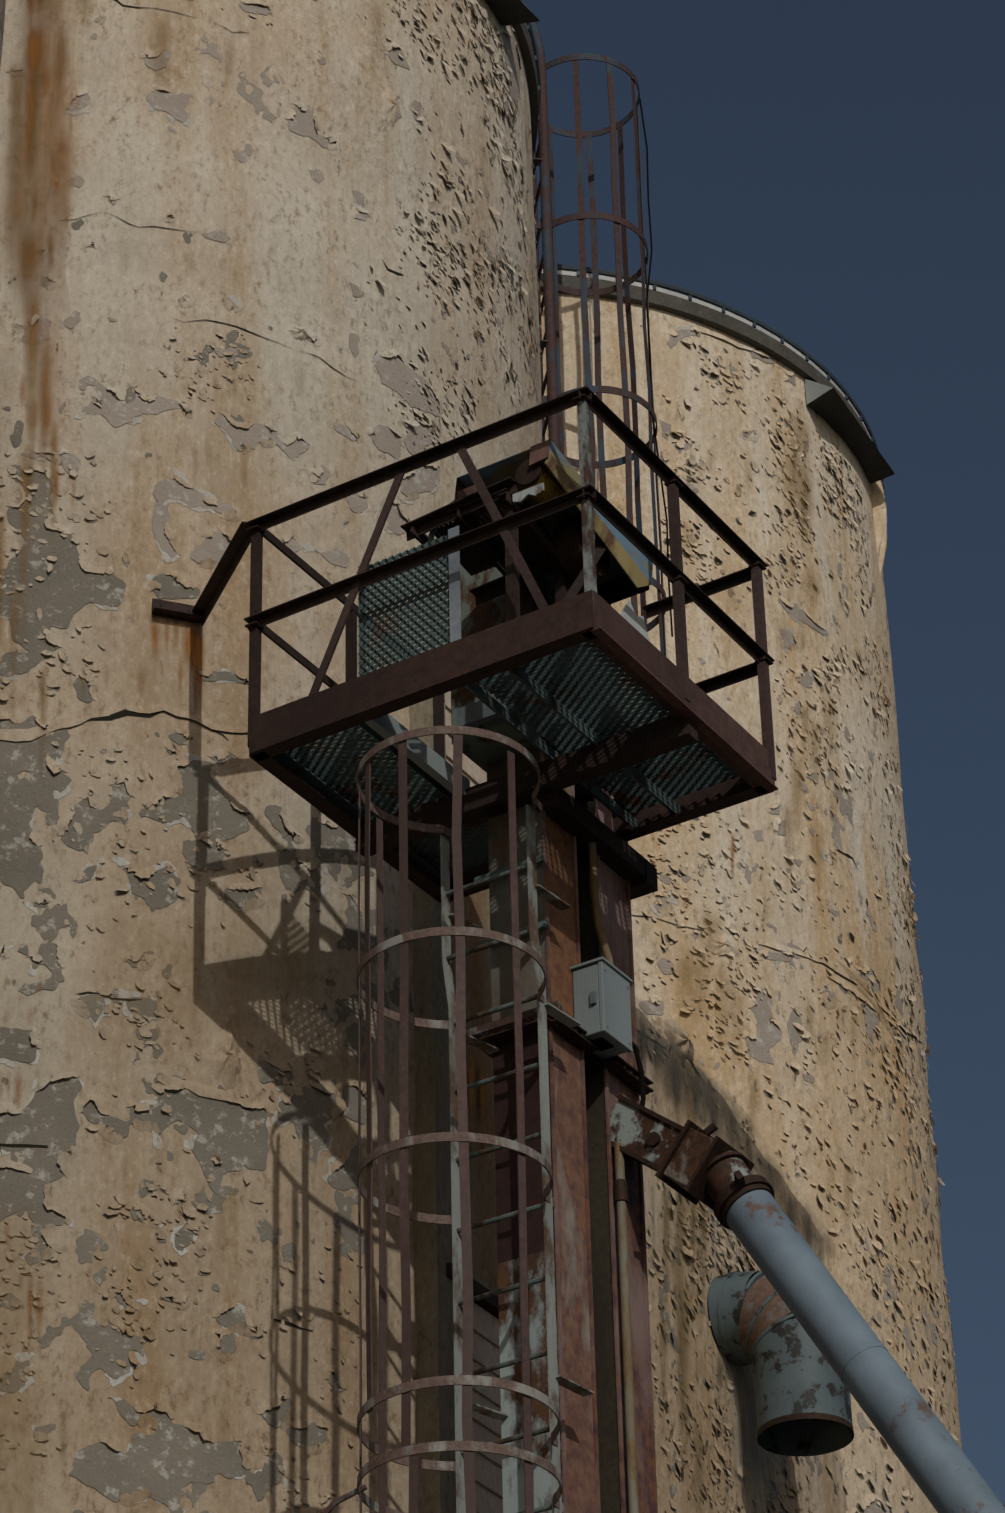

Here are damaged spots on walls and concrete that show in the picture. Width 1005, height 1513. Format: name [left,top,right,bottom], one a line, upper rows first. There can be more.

peeling [221,0,274,25]
corrosion [14,32,64,156]
peeling [138,37,192,133]
peeling [195,35,344,159]
peeling [334,0,543,535]
corrosion [29,303,49,417]
peeling [59,294,330,485]
corrosion [186,629,203,685]
crack [0,703,248,741]
peeling [636,325,959,1443]
peeling [0,406,414,1513]
peeling [646,1178,914,1513]